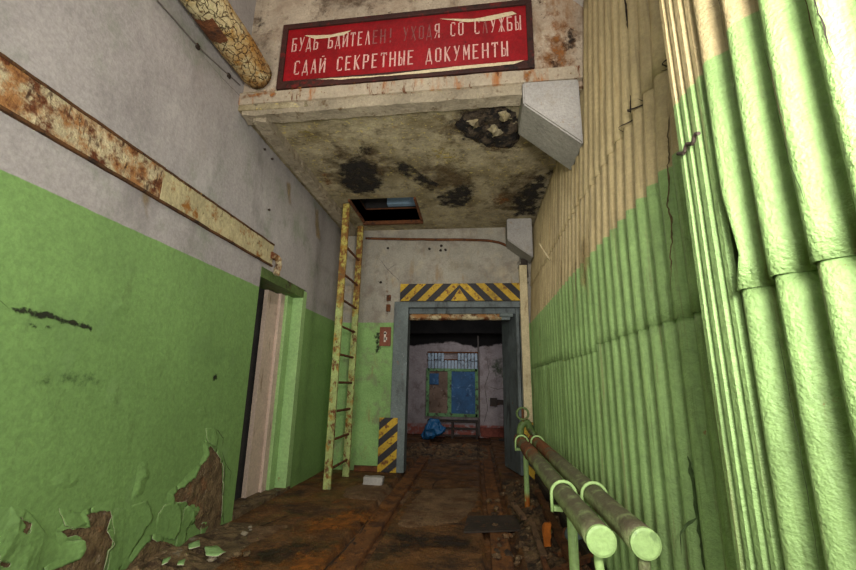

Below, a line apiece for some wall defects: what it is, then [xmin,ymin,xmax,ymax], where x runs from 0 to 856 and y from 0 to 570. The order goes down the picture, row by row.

rust [544,13,573,66]
crack [622,0,630,42]
crack [805,0,836,60]
spalling [455,106,520,149]
crack [618,95,643,132]
crack [755,6,805,202]
water stain [328,147,473,207]
water stain [495,171,552,217]
crack [665,115,673,292]
peeling [0,428,225,570]